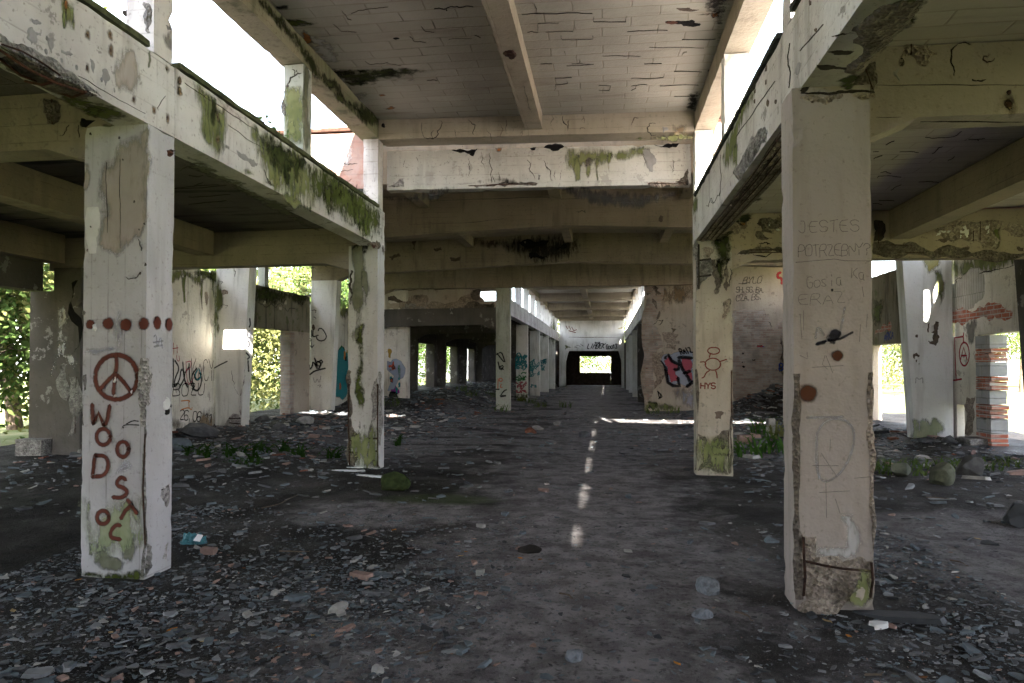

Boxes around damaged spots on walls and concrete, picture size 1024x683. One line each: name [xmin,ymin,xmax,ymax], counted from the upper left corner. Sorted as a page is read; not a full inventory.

crack [411,6,479,43]
crack [522,4,715,97]
spalling [800,0,937,105]
water stain [189,0,395,230]
crack [403,120,507,182]
spalling [530,143,564,151]
water stain [574,153,611,181]
water stain [352,204,369,253]
mould [475,236,577,263]
spalling [872,220,1024,326]
water stain [354,324,365,407]
peeling [692,127,877,601]